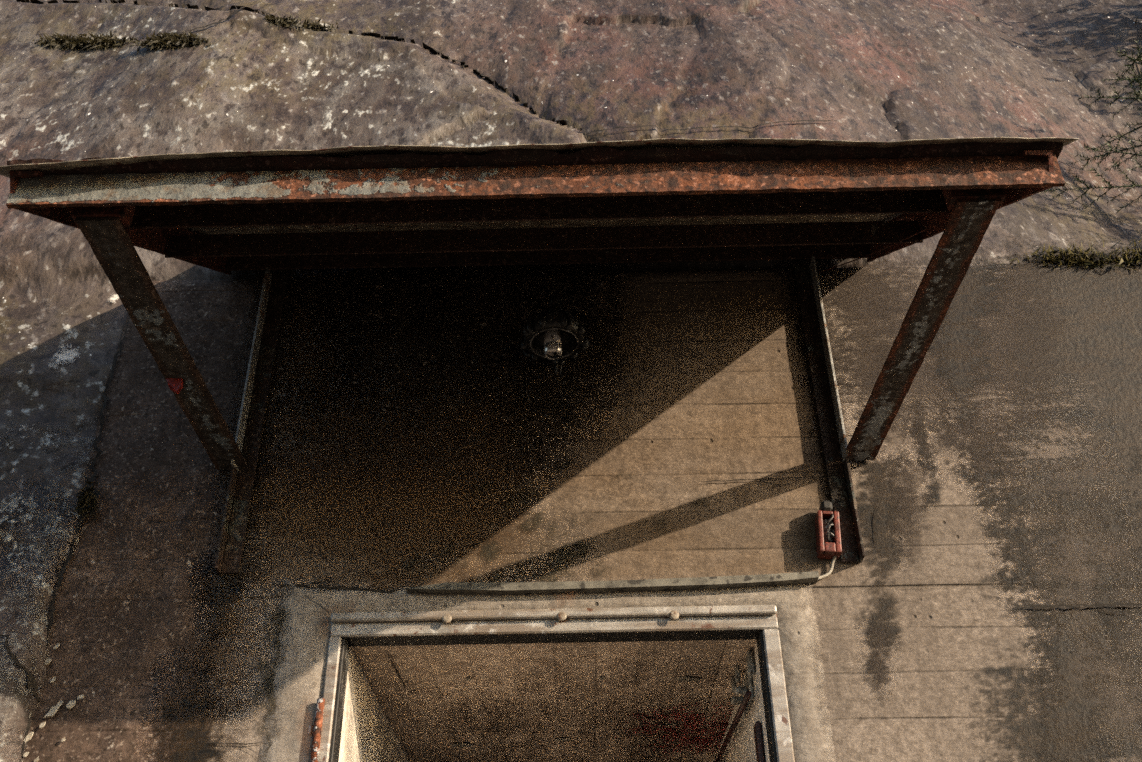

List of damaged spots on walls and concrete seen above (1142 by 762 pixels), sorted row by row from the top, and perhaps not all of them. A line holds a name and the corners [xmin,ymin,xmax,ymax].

water stain [273,334,611,588]
water stain [826,256,927,419]
water stain [855,231,1142,762]